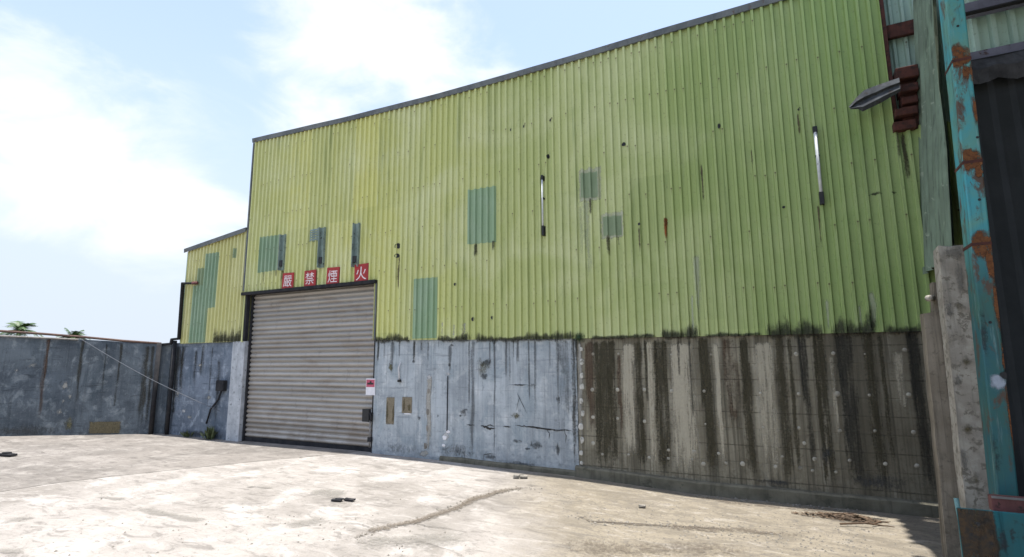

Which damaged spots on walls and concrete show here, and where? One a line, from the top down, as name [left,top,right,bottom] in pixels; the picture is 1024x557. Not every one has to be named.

corrosion [951,43,973,79]
corrosion [962,148,983,177]
corrosion [971,230,1000,327]
leakage [375,324,579,454]
leakage [592,297,935,487]